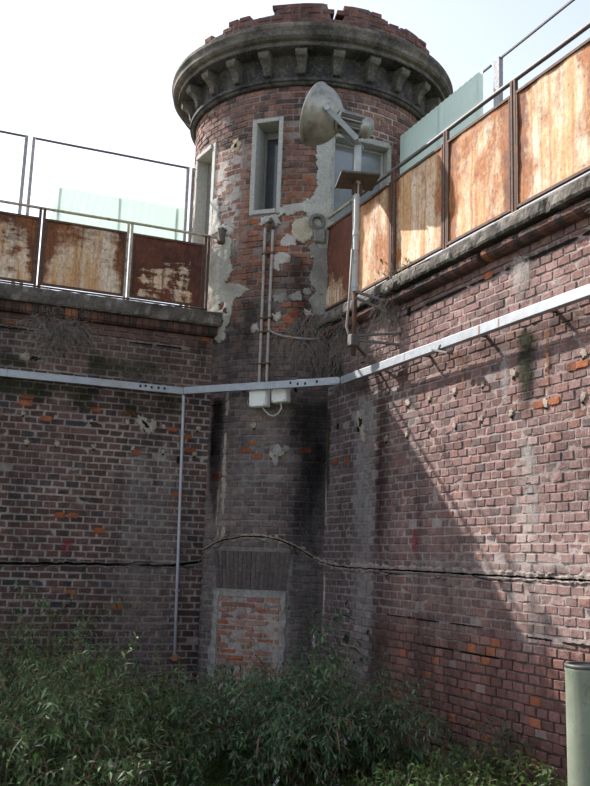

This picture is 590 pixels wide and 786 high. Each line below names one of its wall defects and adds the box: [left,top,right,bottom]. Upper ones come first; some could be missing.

peeling [207,196,250,343]
peeling [260,139,335,342]
spalling [125,410,157,434]
crack [0,532,590,602]